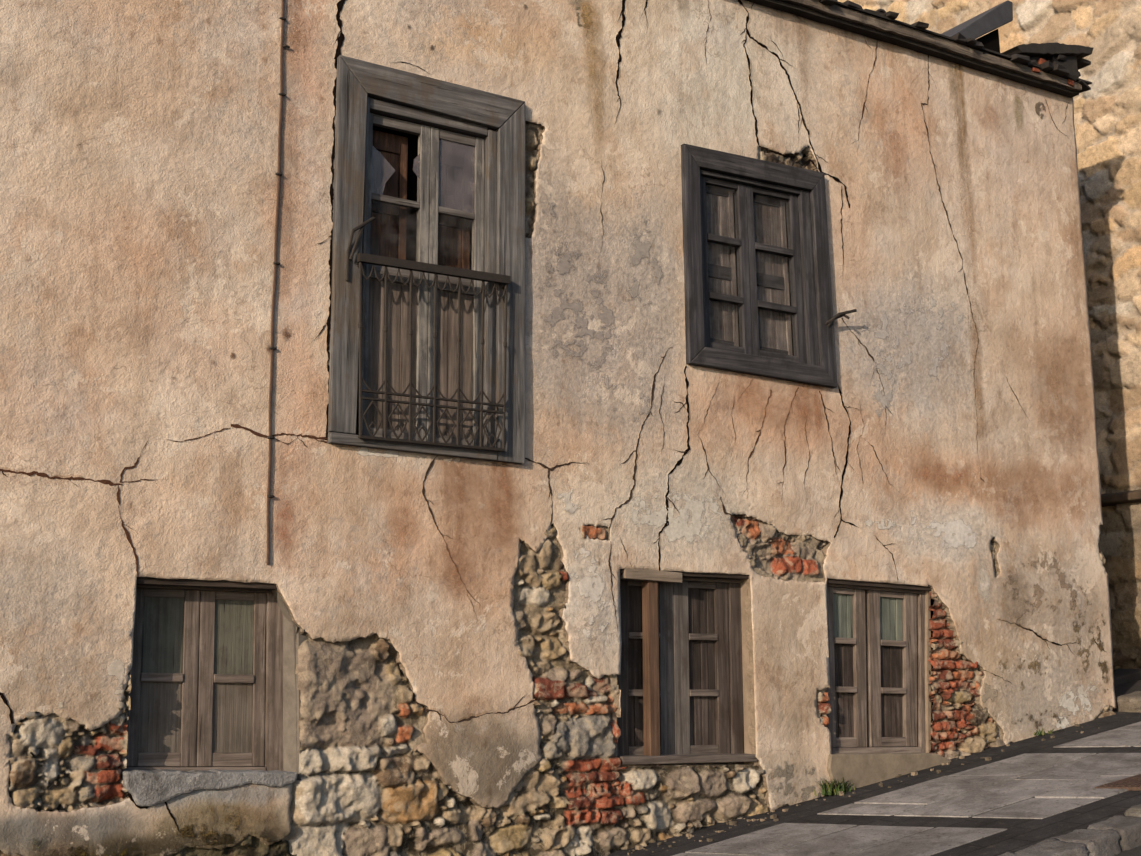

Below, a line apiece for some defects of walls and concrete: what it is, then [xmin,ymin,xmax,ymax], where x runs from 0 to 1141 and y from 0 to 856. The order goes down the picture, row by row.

crack [615,0,647,123]
crack [738,0,878,275]
crack [0,0,345,577]
crack [921,55,985,482]
crack [422,455,480,621]
flaking render [552,564,568,588]
flaking render [580,525,609,540]
crack [603,317,898,629]
flaking render [730,515,828,582]
flaking render [66,713,129,806]
flaking render [531,668,651,832]
flaking render [928,591,982,756]